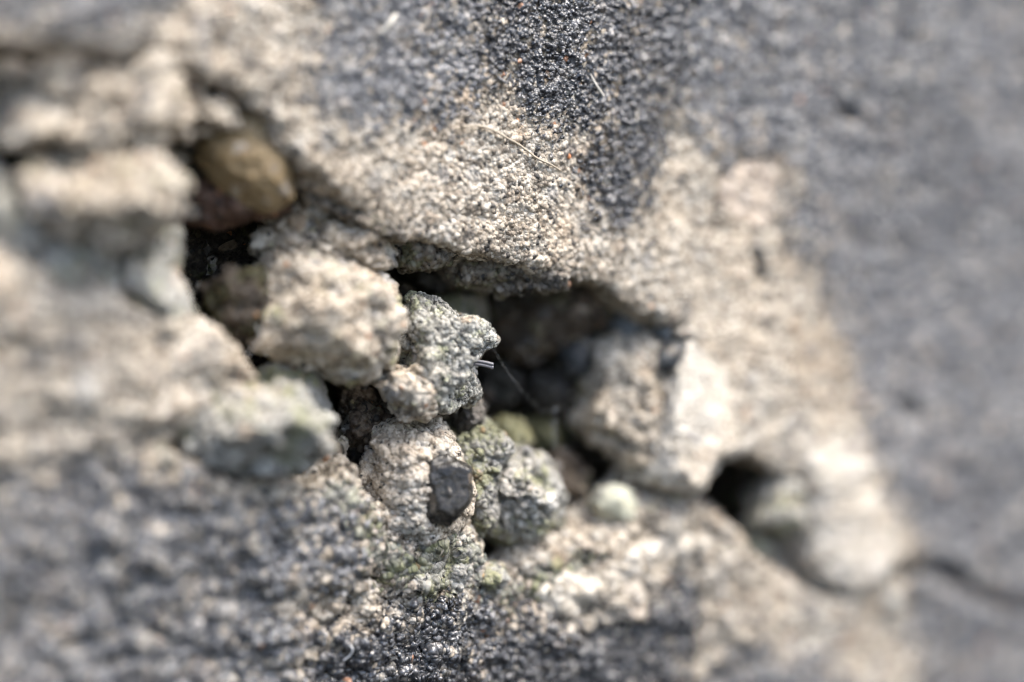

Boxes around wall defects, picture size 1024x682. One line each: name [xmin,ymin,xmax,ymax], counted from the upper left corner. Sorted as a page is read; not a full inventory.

spalling [206,86,230,100]
spalling [0,150,28,174]
peeling [715,150,786,229]
spalling [172,220,264,318]
spalling [294,185,589,334]
hole [750,253,765,279]
spalling [242,351,271,369]
spalling [321,377,365,467]
spalling [476,354,612,488]
spalling [697,459,777,552]
spalling [482,537,498,559]